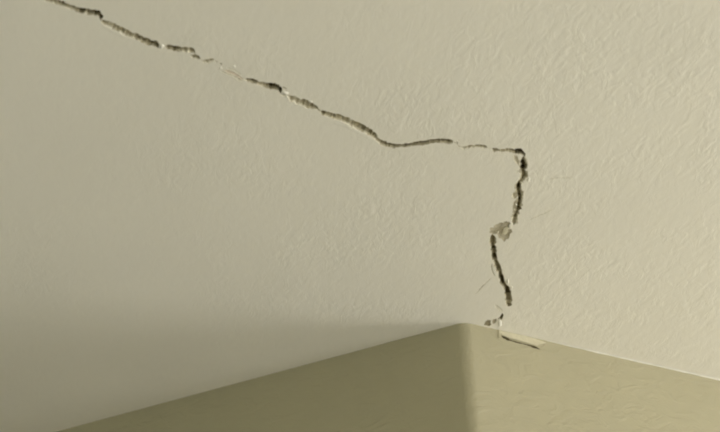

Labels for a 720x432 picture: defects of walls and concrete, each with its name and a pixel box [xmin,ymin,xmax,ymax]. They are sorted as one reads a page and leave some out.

crack [44,0,552,225]
crack [474,235,513,320]